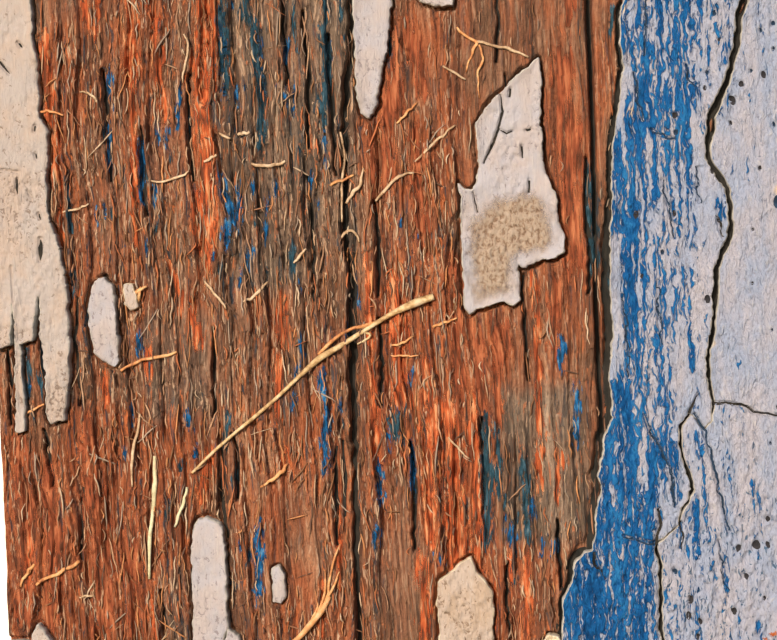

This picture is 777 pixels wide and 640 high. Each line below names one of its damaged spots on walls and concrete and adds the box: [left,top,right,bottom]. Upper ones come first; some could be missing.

peeling [352,0,393,119]
peeling [419,0,455,8]
peeling [0,0,73,433]
peeling [457,57,565,315]
peeling [87,277,141,367]
crack [623,0,777,640]
peeling [12,622,55,640]
peeling [190,515,242,640]
peeling [271,563,288,604]
peeling [436,555,495,640]